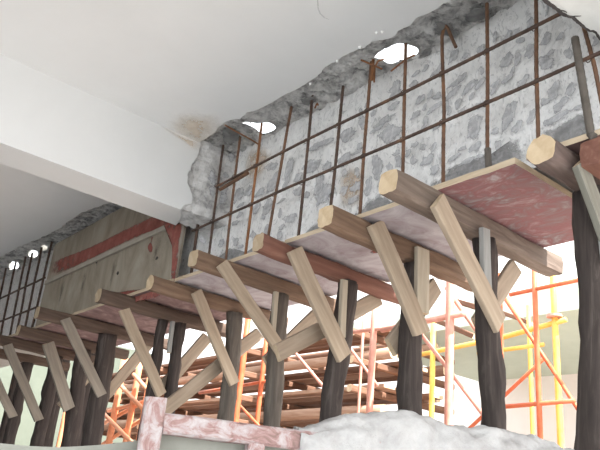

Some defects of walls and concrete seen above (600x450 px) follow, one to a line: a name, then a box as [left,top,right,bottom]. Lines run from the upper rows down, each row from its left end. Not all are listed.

spalling [179,0,586,260]
spalling [582,28,600,104]
spalling [0,202,123,335]